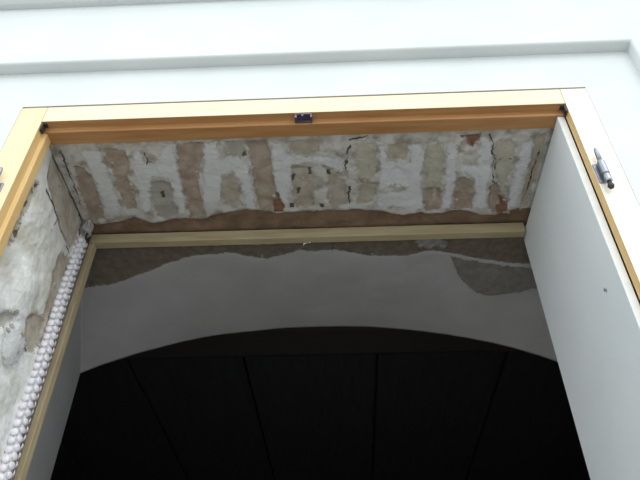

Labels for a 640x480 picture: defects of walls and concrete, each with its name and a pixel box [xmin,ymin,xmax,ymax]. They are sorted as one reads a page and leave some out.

crack [46,150,82,251]
spalling [105,148,138,210]
spalling [150,180,178,219]
spalling [176,141,207,218]
spalling [221,139,280,212]
spalling [289,166,347,208]
crack [342,135,368,204]
spalling [452,178,475,210]
spalling [460,132,482,147]
crack [488,134,511,190]
spalling [0,154,105,354]
spalling [85,235,530,288]